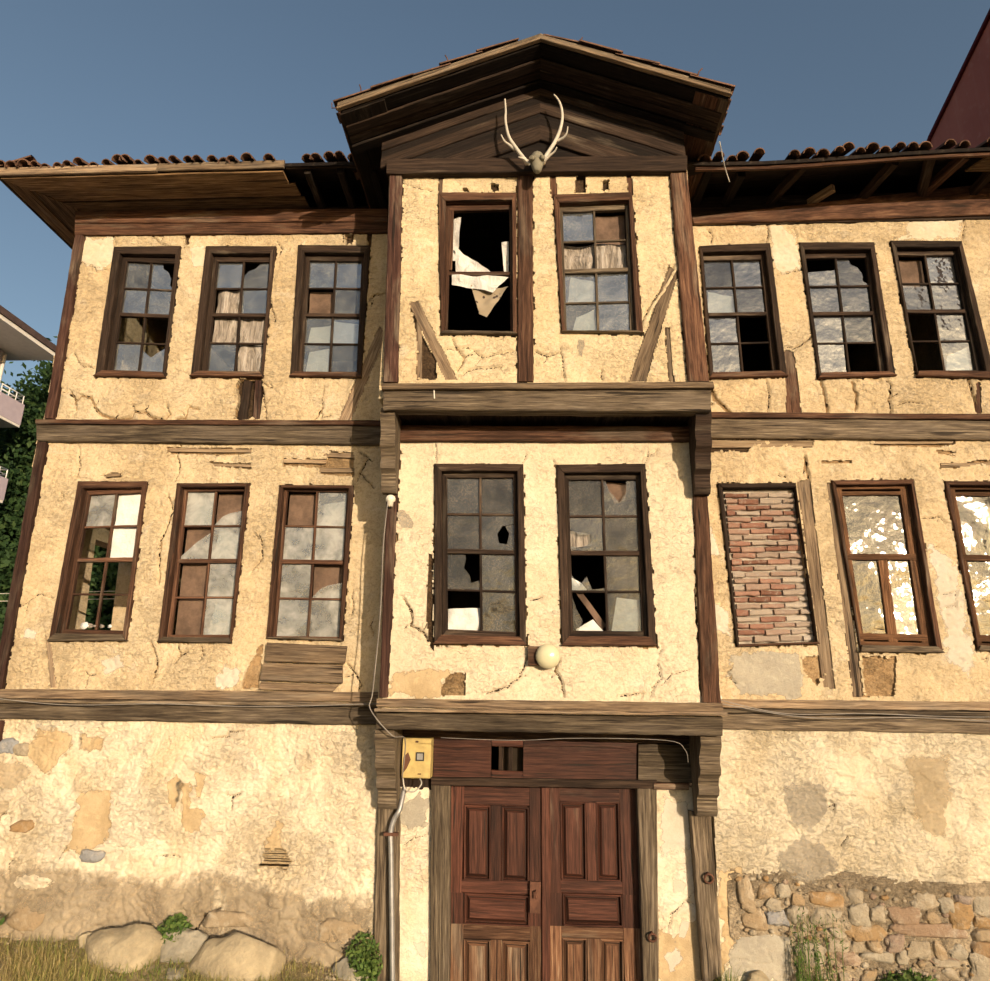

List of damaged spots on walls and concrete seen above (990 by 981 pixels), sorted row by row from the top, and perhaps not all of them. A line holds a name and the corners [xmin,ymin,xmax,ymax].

crack [447,339,564,376]
crack [60,392,199,420]
peeling [388,669,467,699]
crack [486,660,528,696]
crack [551,666,564,696]
spalling [859,652,898,698]
peeling [0,727,104,788]
peeling [167,771,206,833]
peeling [903,756,953,835]
flaking render [9,820,35,833]
peeling [64,790,112,863]